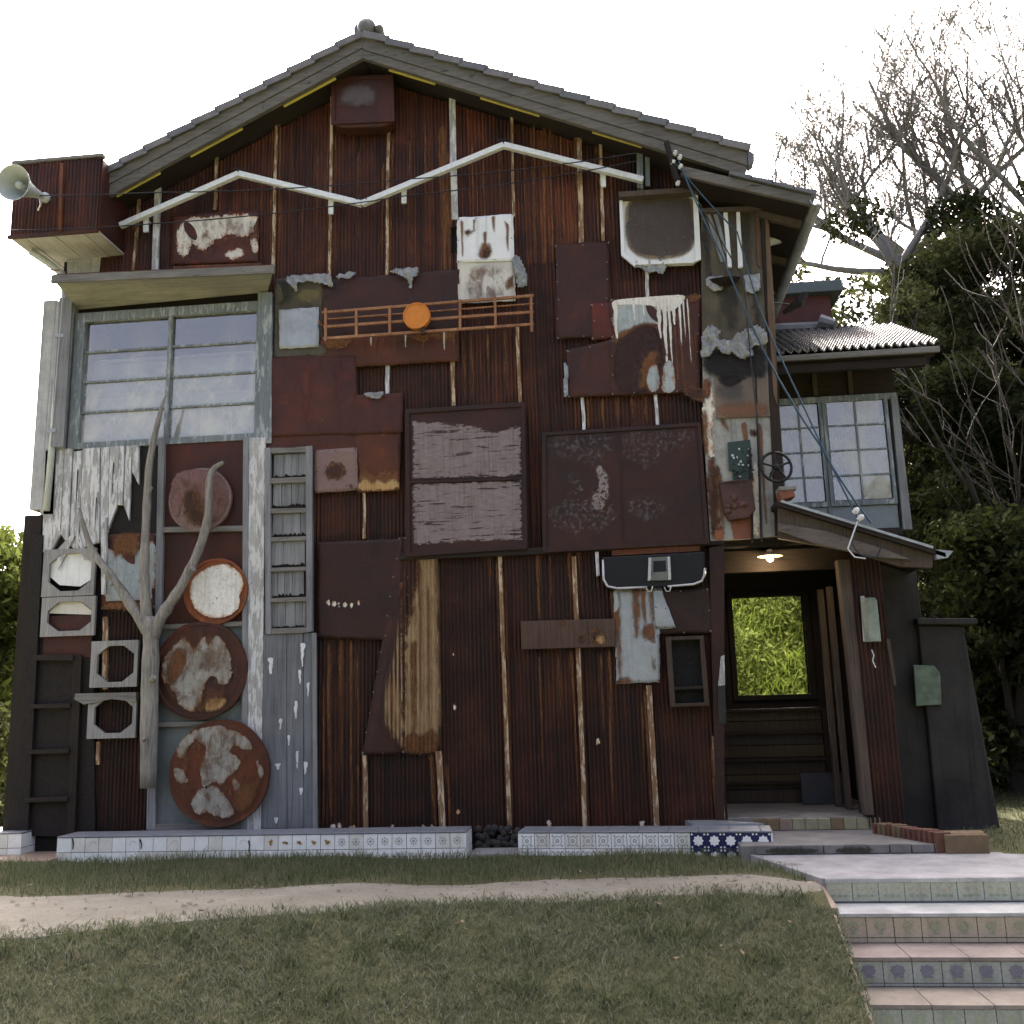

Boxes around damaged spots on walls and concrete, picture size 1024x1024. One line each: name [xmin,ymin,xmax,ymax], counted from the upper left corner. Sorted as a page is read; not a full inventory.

peeling [176,213,258,260]
corrosion [424,125,514,297]
leakage [625,197,711,277]
leakage [742,213,751,273]
corrosion [584,323,663,429]
corrosion [325,461,399,491]
peeling [412,421,523,545]
corrosion [741,422,767,524]
peeling [279,718,308,774]
peeling [294,643,310,717]
corrosion [385,559,460,827]
corrosion [558,589,655,826]